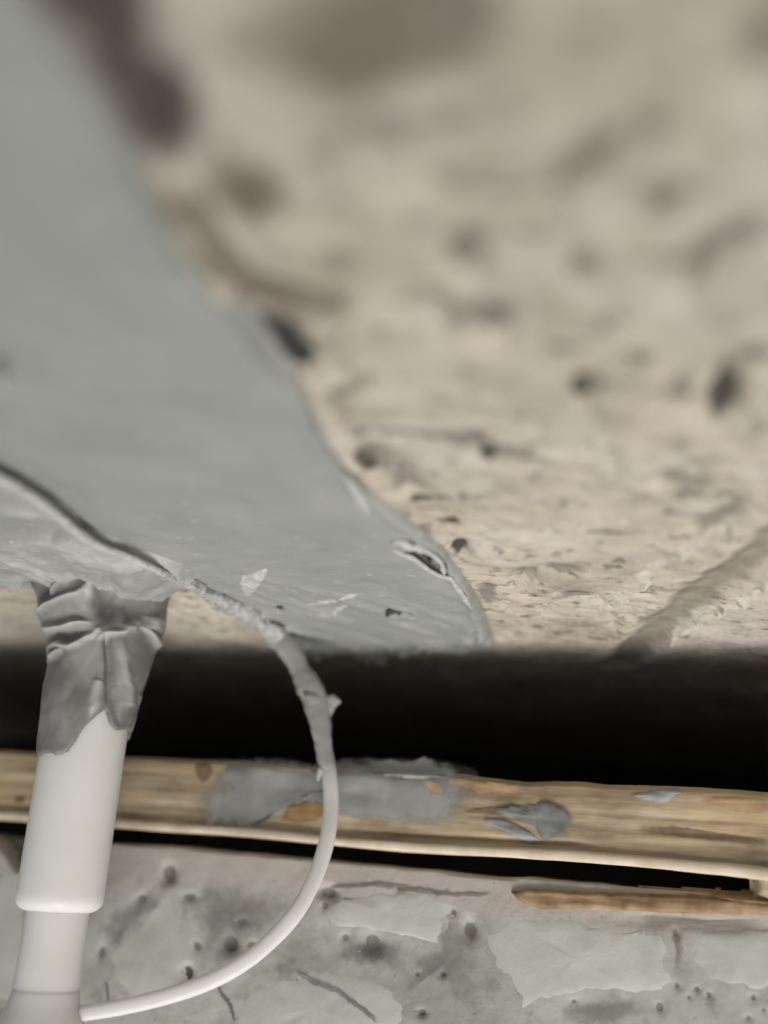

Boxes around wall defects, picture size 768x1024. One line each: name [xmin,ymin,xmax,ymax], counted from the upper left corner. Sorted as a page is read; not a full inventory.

spalling [354,446,440,502]